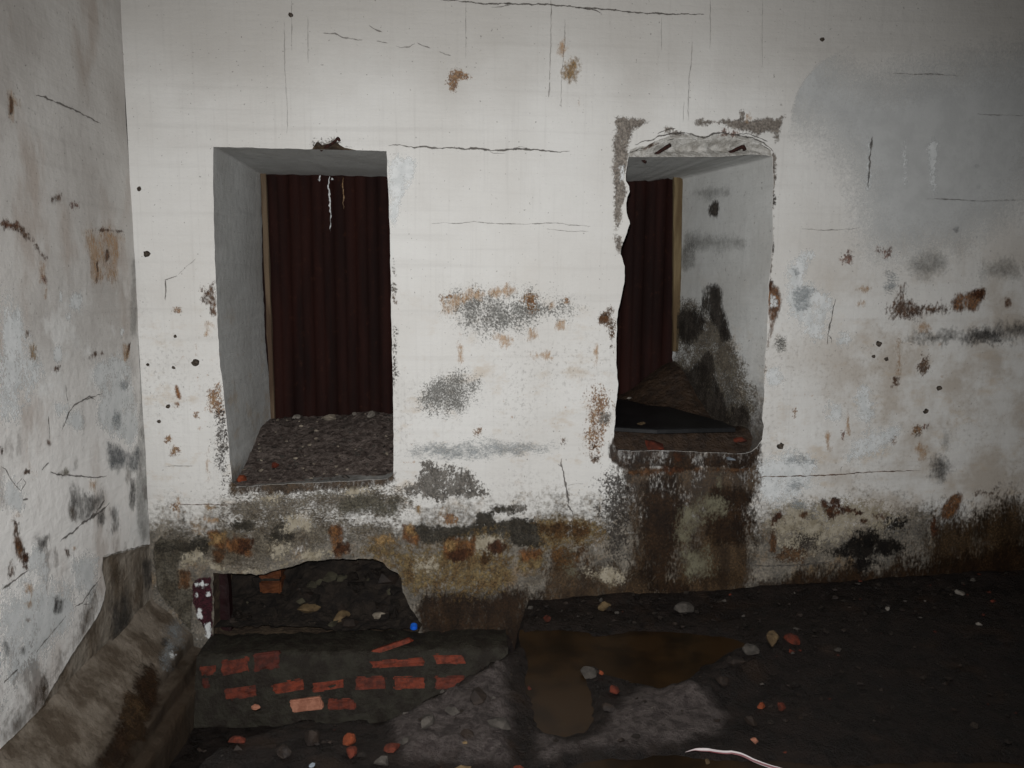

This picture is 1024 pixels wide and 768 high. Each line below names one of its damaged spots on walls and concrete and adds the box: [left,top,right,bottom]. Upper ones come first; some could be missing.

crack [444,0,704,15]
rust [445,70,469,93]
crack [36,95,99,123]
crack [389,144,567,152]
peeling [612,57,1024,251]
rust [886,286,986,329]
leakage [675,284,757,430]
rust [916,358,930,376]
leakage [416,367,480,419]
rust [583,383,615,464]
crack [762,467,918,477]
leakage [164,399,1024,649]